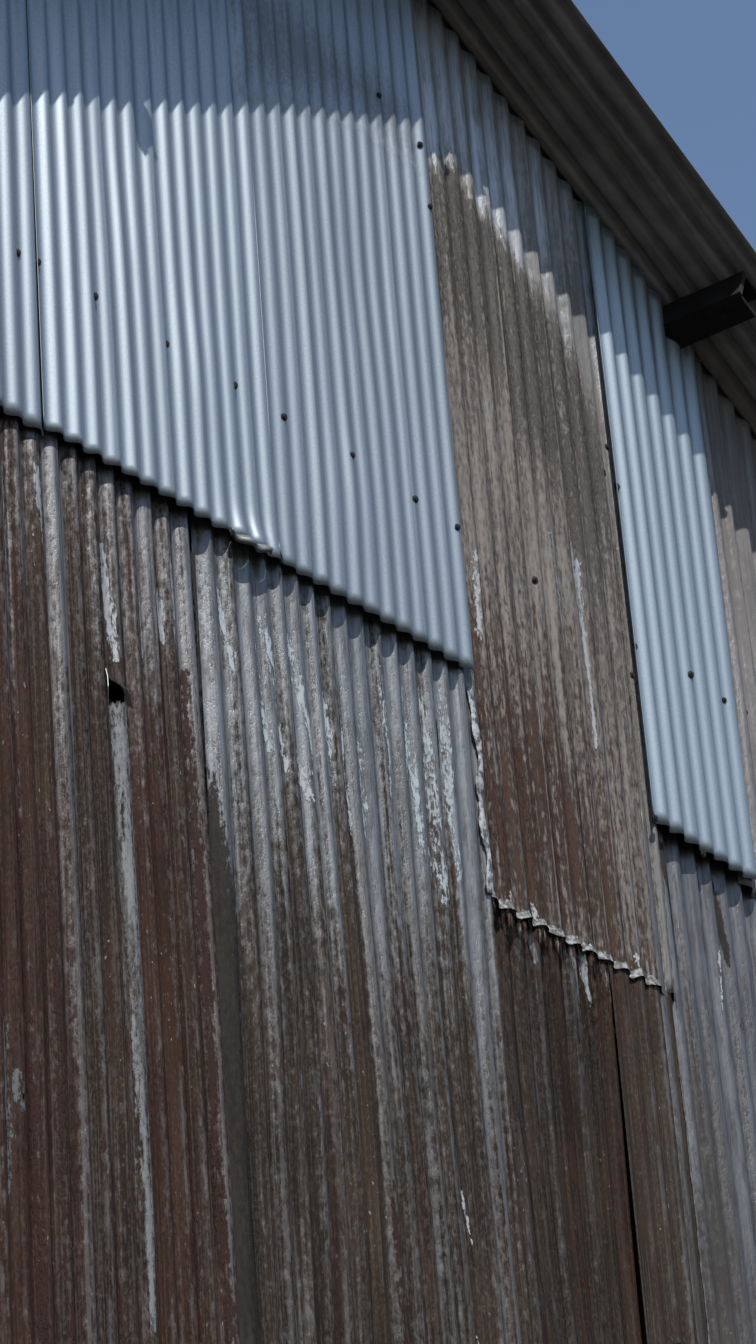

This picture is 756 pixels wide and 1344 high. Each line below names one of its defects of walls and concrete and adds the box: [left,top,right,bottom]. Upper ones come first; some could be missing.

rust [426,148,690,1077]
rust [391,1178,408,1344]